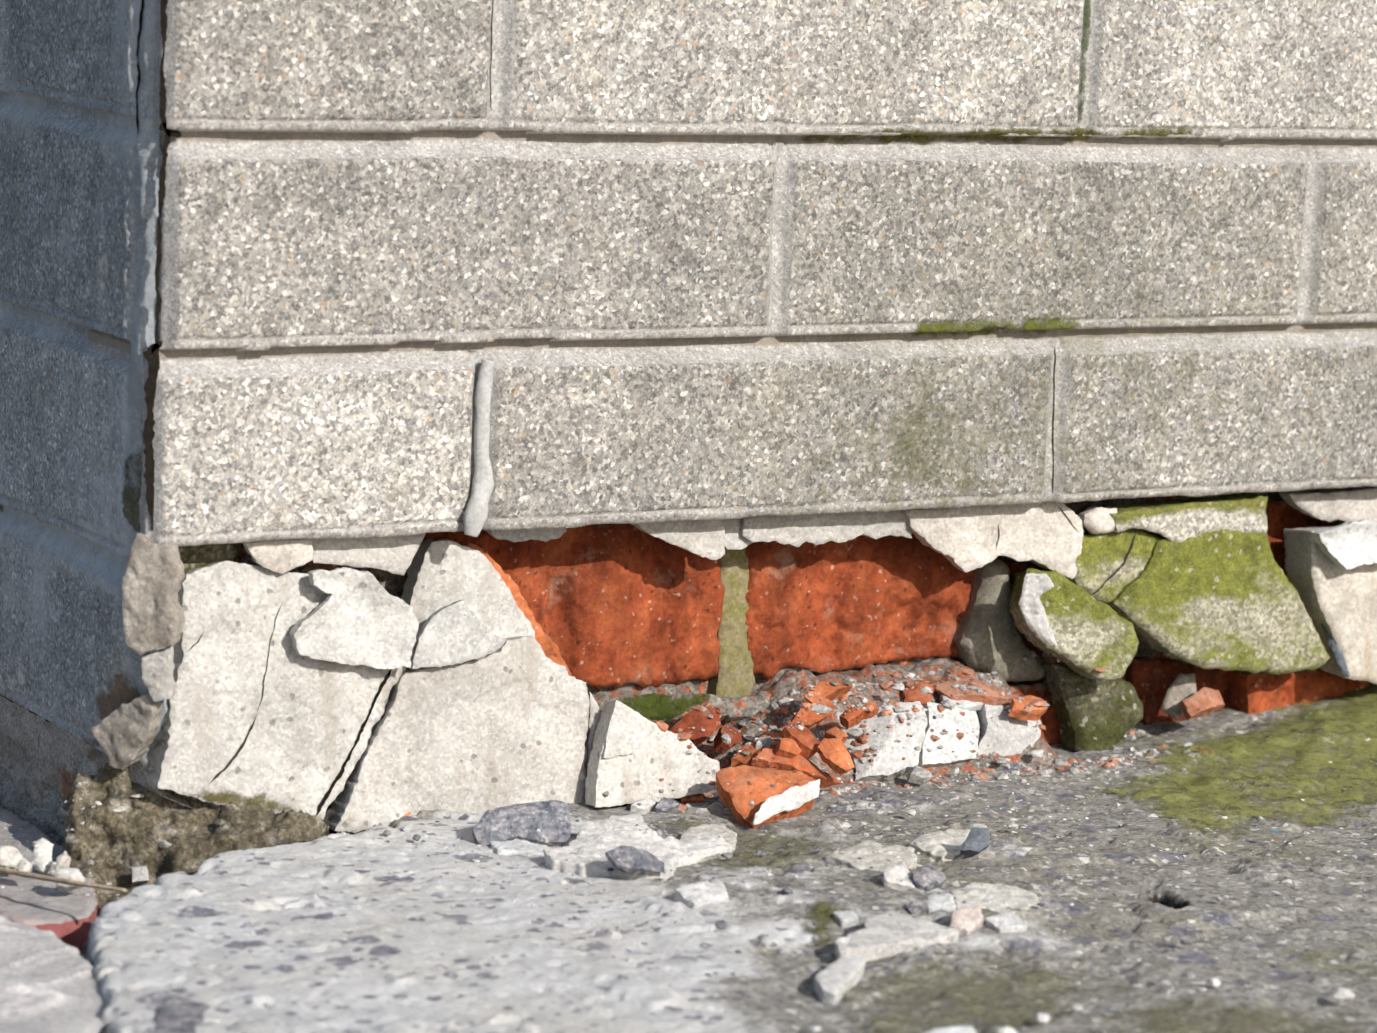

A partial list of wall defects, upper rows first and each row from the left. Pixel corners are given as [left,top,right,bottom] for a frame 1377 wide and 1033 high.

crack [136,0,181,531]
spalling [1266,498,1334,577]
crack [208,607,281,785]
peeling [289,567,419,669]
crack [316,669,392,815]
peeling [630,798,657,814]
spalling [423,502,1084,759]
spalling [1125,657,1370,725]